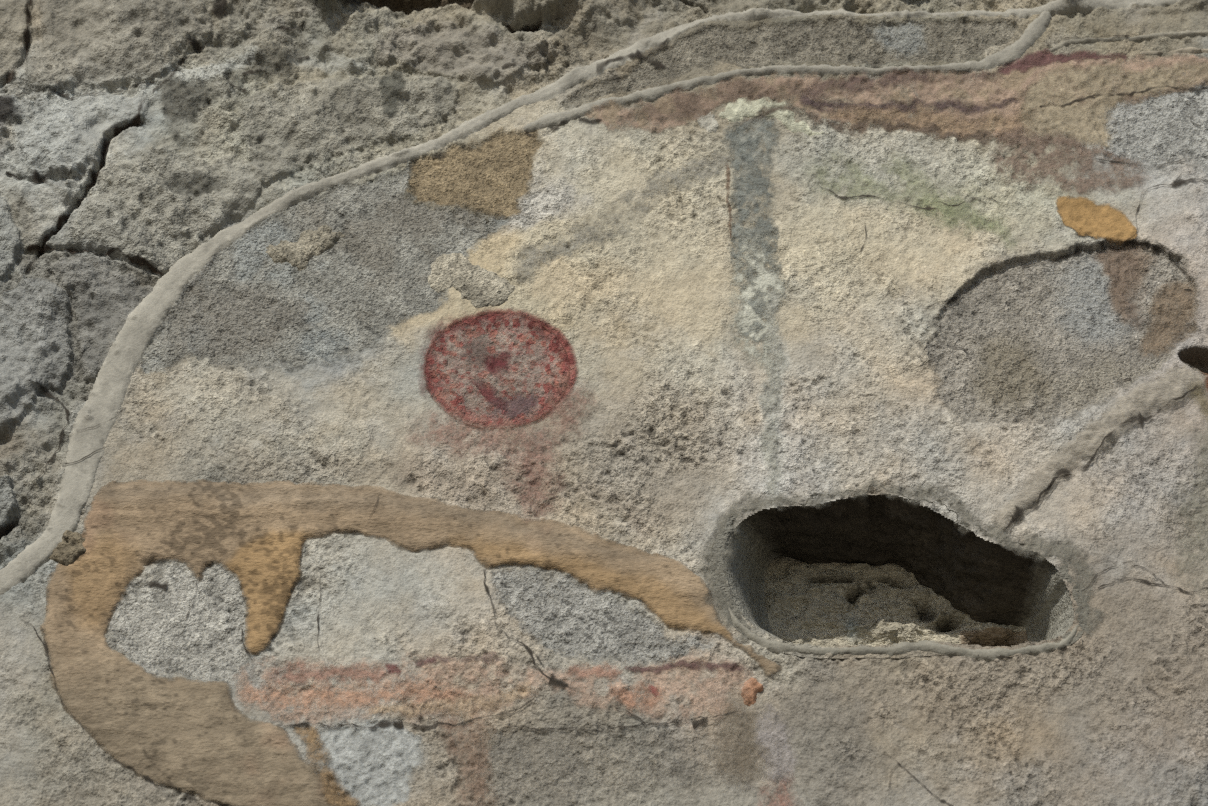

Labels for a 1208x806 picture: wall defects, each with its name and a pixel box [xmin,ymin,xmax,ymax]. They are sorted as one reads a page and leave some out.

crack [1039,85,1208,126]
flaking render [925,240,1208,424]
crack [30,385,99,491]
crack [1006,386,1198,529]
crack [276,569,733,732]
crack [895,762,953,806]